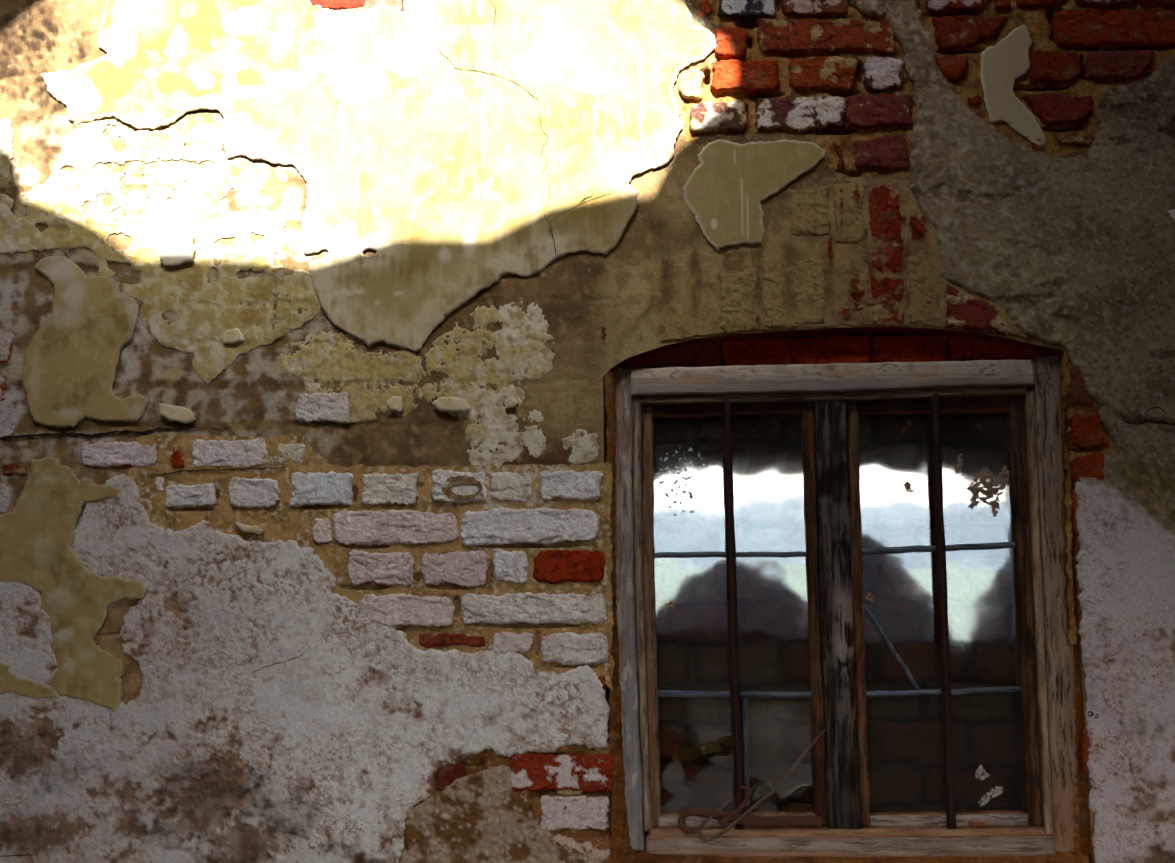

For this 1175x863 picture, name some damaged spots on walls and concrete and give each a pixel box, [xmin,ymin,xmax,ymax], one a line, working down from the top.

crack [409,16,614,255]
spalling [916,0,1175,158]
flaking render [0,0,1027,712]
crack [1120,406,1175,426]
damp [152,761,312,836]
damp [328,843,385,863]
spalling [413,742,614,863]